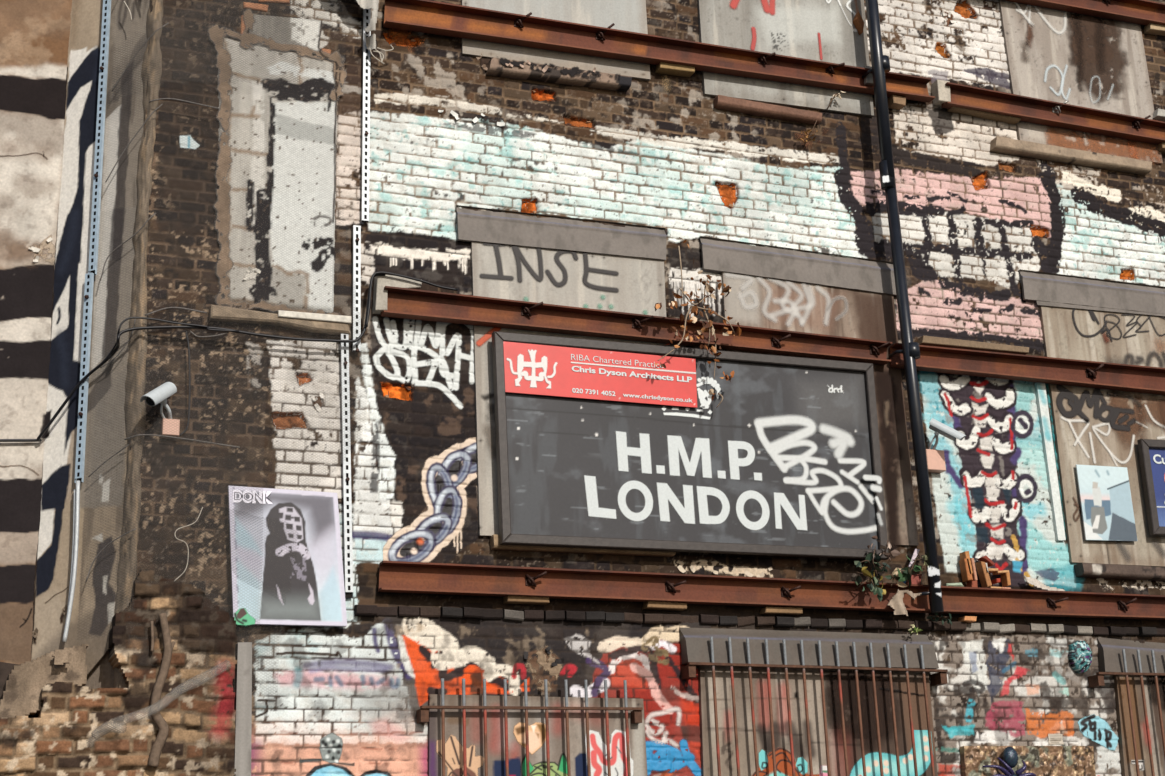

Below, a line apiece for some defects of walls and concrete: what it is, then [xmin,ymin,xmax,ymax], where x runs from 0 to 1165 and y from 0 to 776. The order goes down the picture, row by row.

spalling [531,89,556,102]
peeling [438,110,508,129]
spalling [563,116,595,129]
spalling [715,181,738,209]
spalling [521,198,538,214]